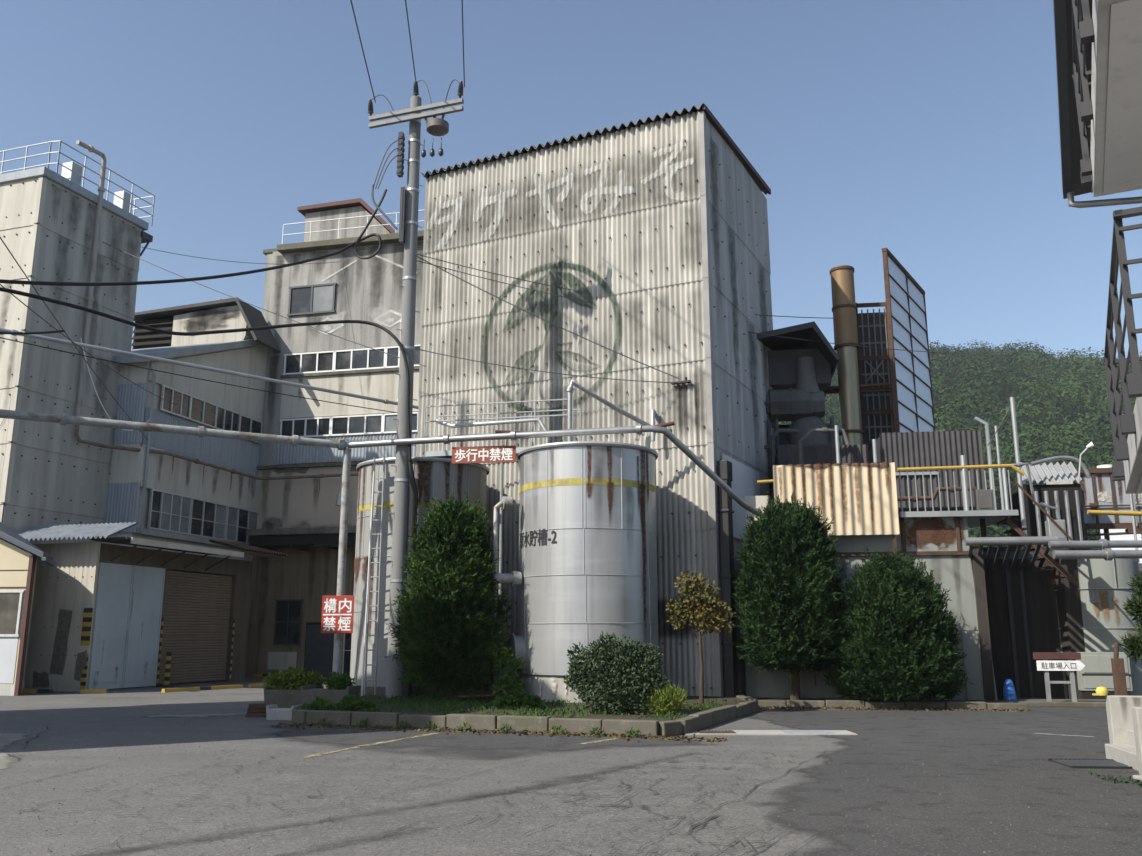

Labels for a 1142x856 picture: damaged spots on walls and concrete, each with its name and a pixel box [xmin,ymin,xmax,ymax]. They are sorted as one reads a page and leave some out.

leakage [677,375,699,423]
rust [417,461,463,505]
rust [778,462,889,521]
rust [352,464,373,635]
rust [637,450,649,627]
rust [901,517,964,549]
rust [1093,591,1119,620]
crack [48,750,826,856]